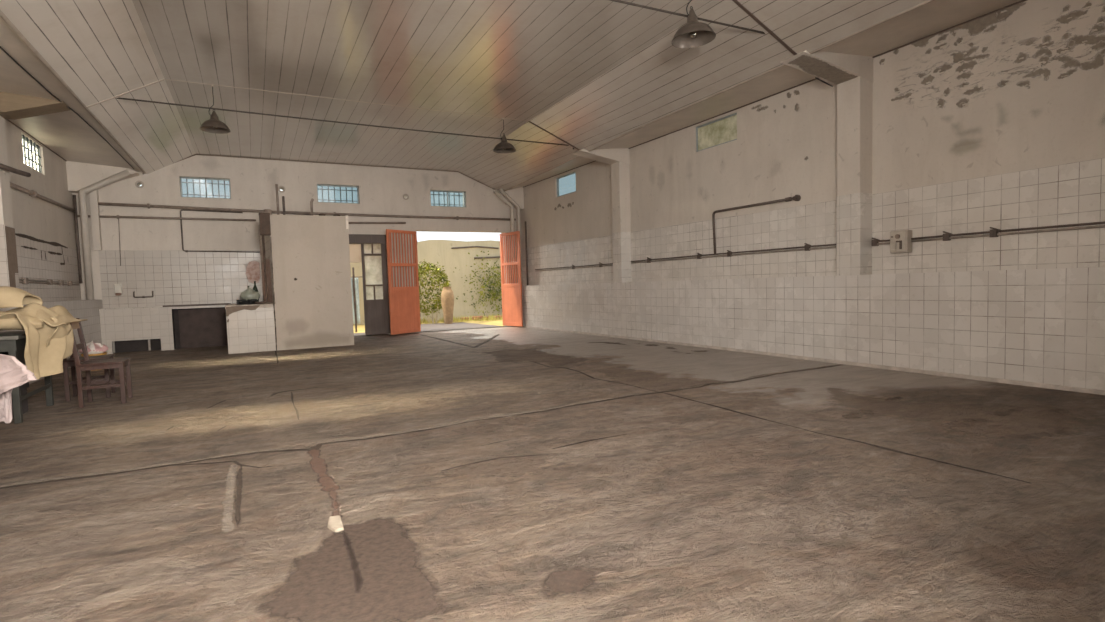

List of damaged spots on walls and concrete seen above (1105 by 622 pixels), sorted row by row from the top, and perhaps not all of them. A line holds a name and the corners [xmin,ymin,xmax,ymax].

peeling [912,2,1105,108]
crack [0,362,1030,489]
water stain [256,518,447,622]
water stain [544,567,596,598]